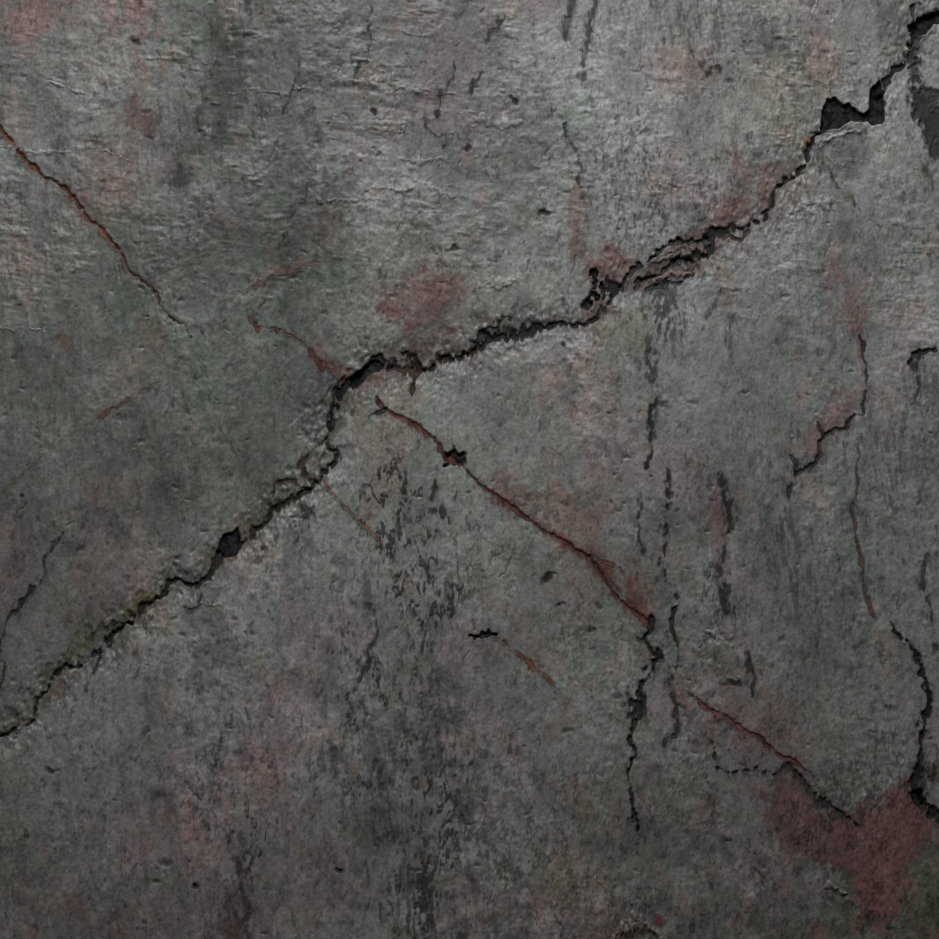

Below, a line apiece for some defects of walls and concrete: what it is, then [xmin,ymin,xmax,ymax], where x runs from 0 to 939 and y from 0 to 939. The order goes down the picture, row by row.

corrosion [0,0,74,55]
crack [0,2,939,737]
crack [368,396,859,832]
crack [787,335,939,824]
crack [232,848,251,939]
crack [414,837,436,939]
corrosion [752,769,938,937]